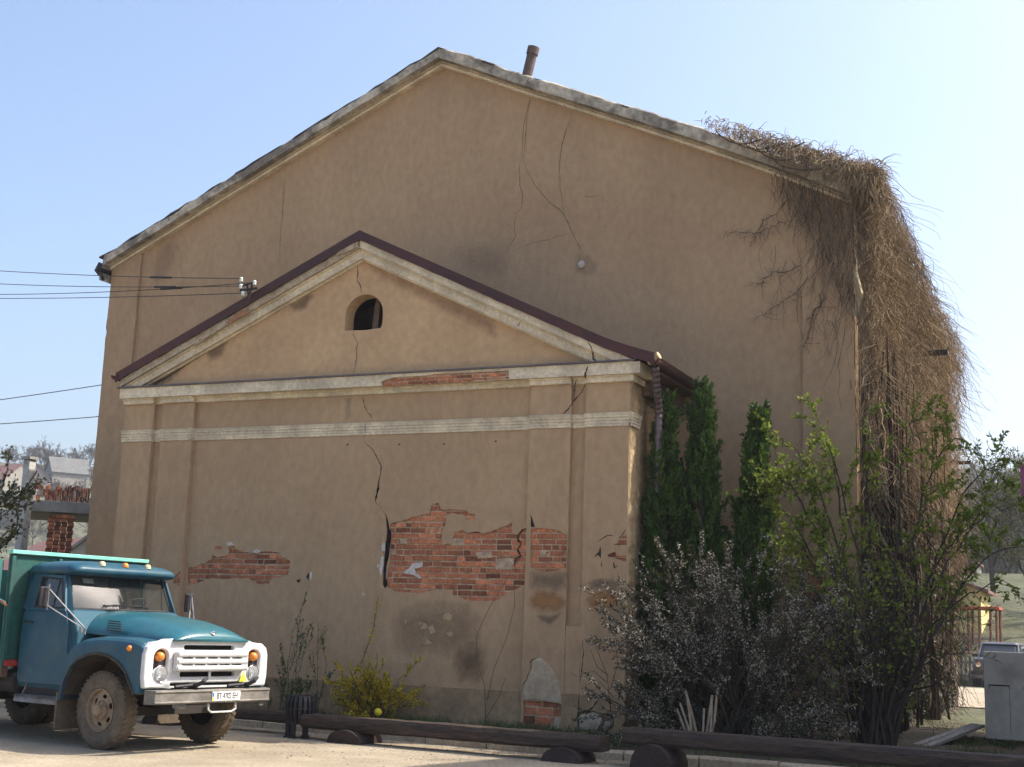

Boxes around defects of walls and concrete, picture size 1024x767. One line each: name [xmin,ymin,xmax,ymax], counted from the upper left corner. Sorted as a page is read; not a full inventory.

crack [503,79,598,265]
flaking render [382,371,509,386]
crack [563,342,596,414]
crack [363,399,391,589]
flaking render [174,542,312,586]
flaking render [387,503,567,601]
flaking render [594,536,627,561]
peeling [522,657,561,731]